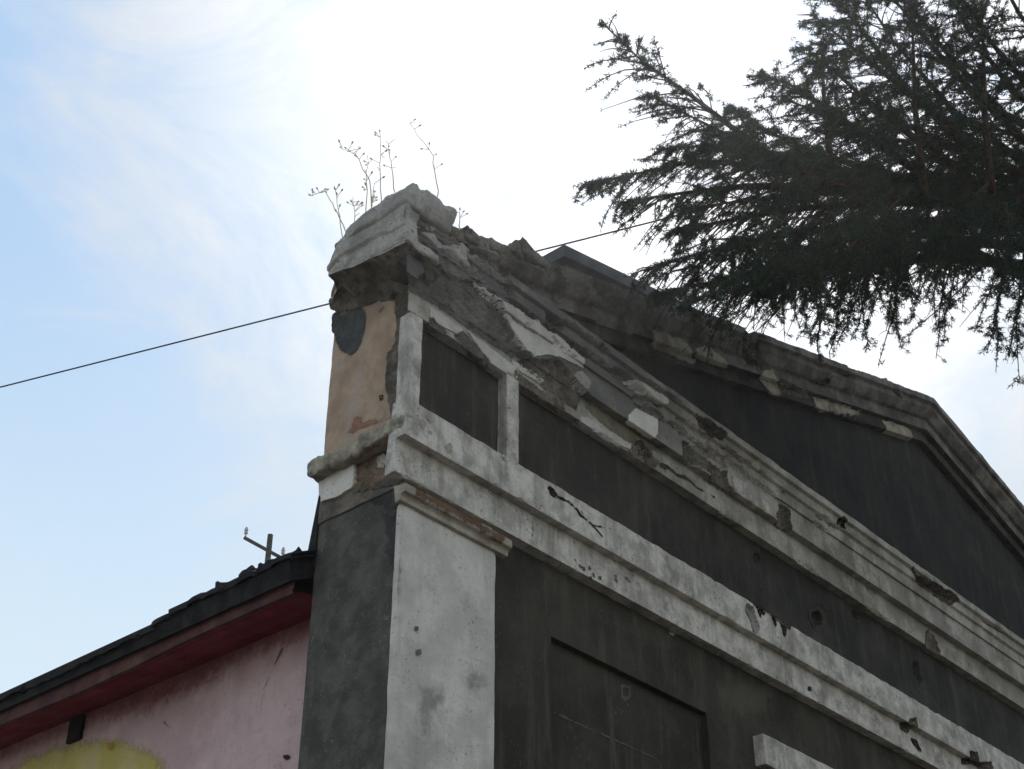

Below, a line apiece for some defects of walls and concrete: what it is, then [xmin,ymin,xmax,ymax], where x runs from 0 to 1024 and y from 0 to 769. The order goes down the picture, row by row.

spalling [328,243,440,433]
spalling [695,414,728,441]
crack [548,486,611,545]
spalling [910,566,960,605]
spalling [745,603,791,637]